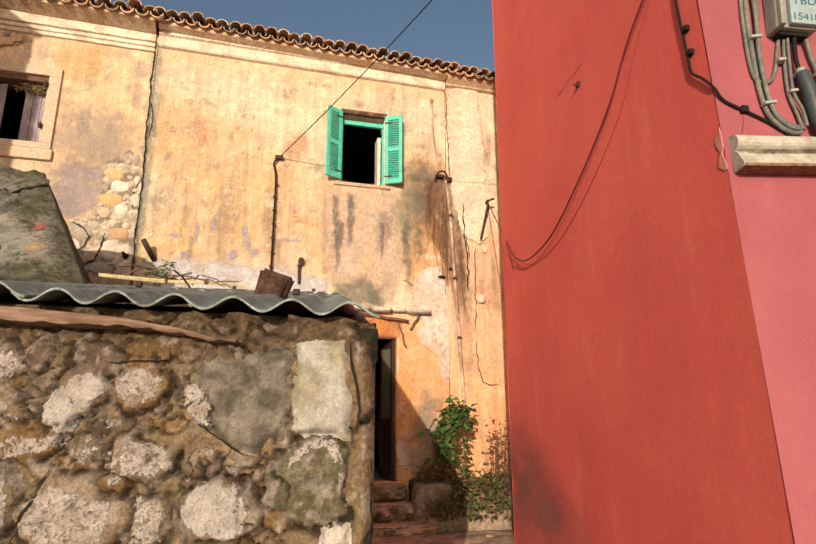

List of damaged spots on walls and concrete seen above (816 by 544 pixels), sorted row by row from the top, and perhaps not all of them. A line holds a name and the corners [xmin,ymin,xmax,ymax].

crack [71,221,106,265]
flaking render [67,150,143,276]
crack [128,43,157,304]
leakage [333,195,355,265]
peeling [366,265,450,441]
crack [462,204,498,386]